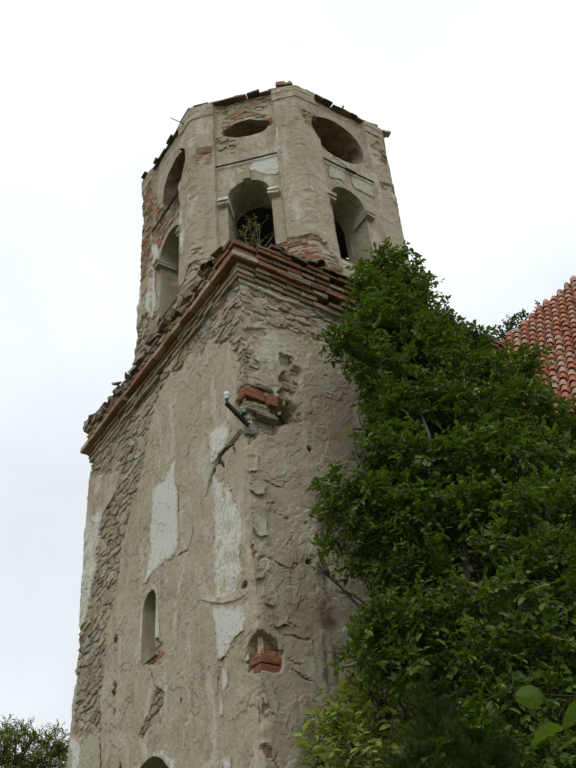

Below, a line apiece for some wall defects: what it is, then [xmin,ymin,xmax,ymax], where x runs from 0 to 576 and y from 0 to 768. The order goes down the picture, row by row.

peeling [191,96,282,175]
spalling [135,181,211,359]
spalling [277,236,341,272]
spalling [69,282,351,768]